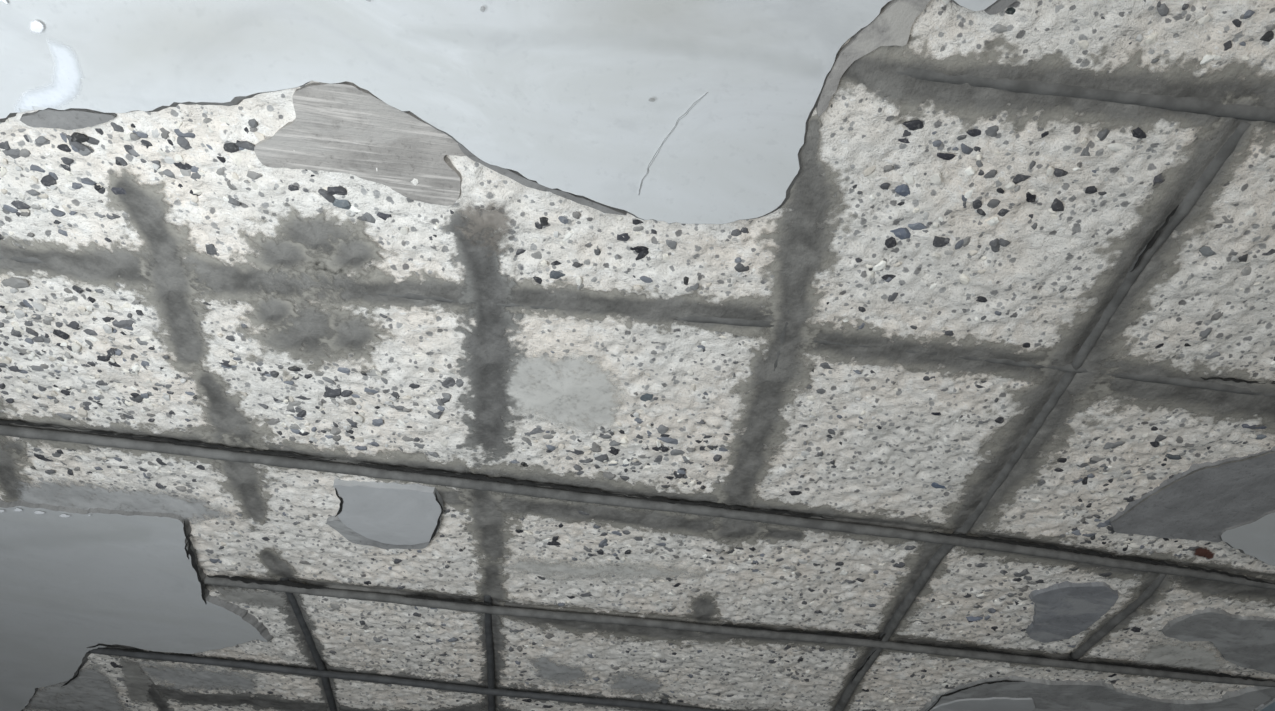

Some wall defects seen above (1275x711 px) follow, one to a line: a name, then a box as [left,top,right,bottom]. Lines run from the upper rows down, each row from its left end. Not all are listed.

water stain [30,21,44,33]
spalling [0,270,770,494]
spalling [0,25,1211,354]
water stain [0,35,1275,581]
spalling [0,436,1275,711]
crack [639,92,708,191]
water stain [146,477,1275,711]
spalling [754,353,1037,524]
spalling [895,0,1275,81]
spalling [981,388,1275,574]
spalling [1108,126,1275,385]